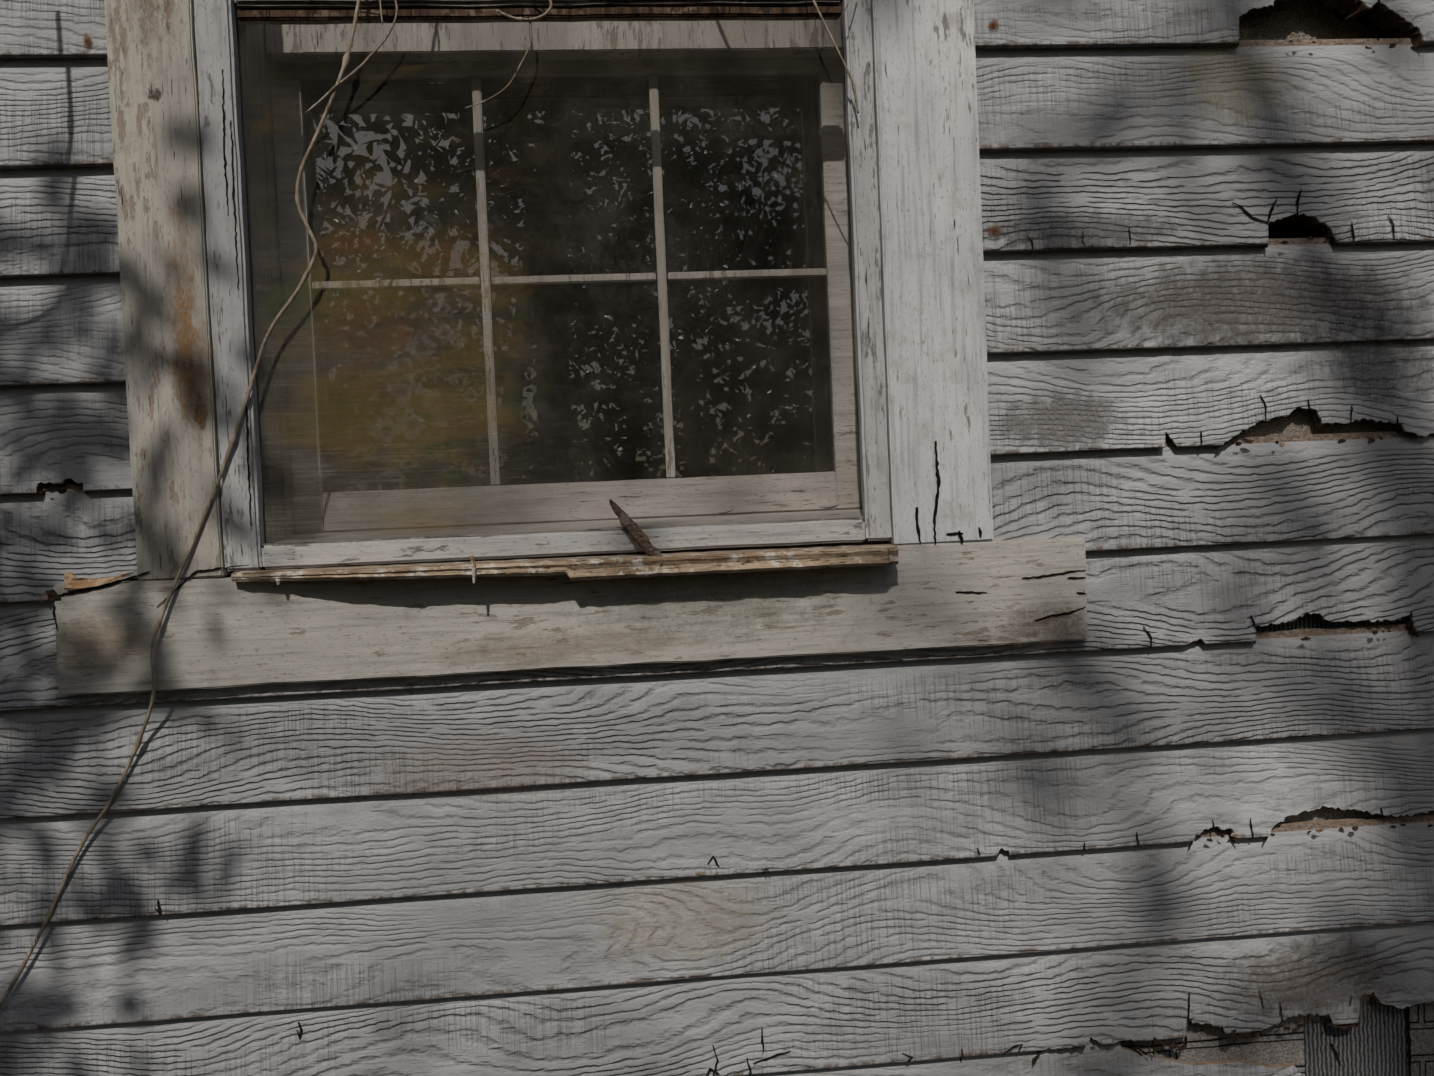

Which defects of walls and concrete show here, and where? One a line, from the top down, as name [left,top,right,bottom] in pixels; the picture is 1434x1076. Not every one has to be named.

spalling [1316,0,1399,48]
crack [915,441,982,545]